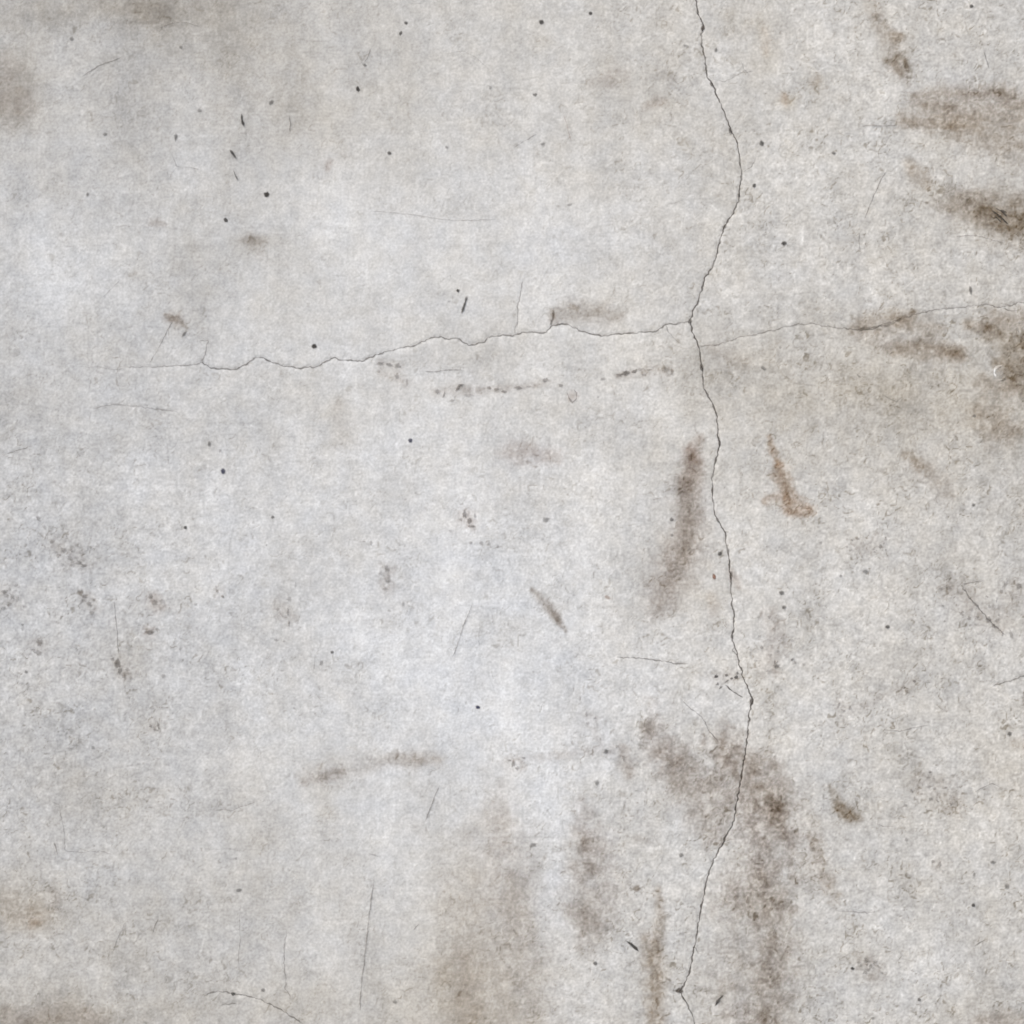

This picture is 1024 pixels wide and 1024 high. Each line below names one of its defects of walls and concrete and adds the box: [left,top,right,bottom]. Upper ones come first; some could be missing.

crack [406,0,753,1010]